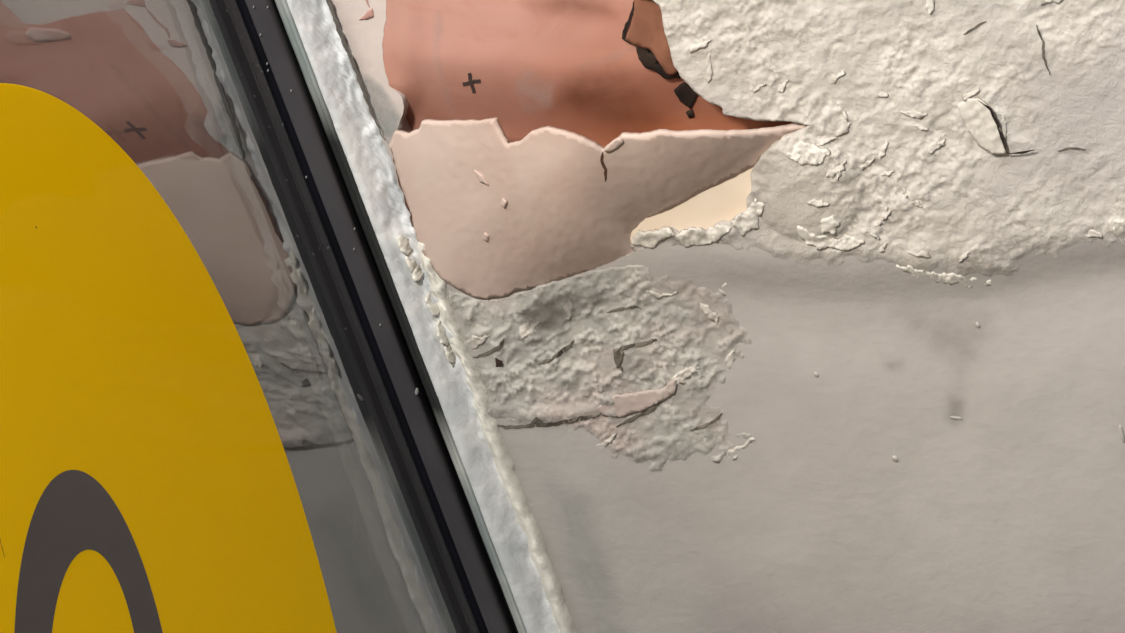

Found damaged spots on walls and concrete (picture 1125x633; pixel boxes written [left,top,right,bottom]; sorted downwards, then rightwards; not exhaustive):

flaking render [359,0,1125,472]
crack [978,100,1086,154]